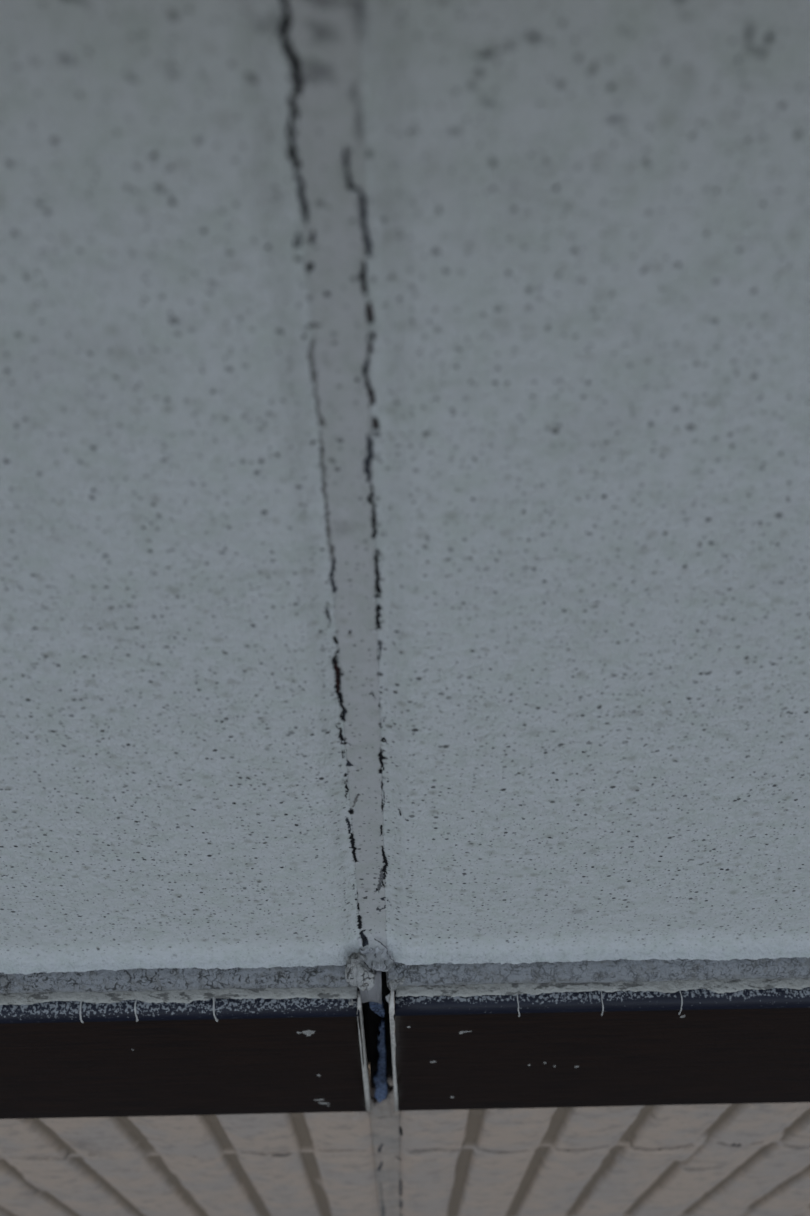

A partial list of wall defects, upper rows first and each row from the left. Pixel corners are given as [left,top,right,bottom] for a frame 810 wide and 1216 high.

crack [266,0,329,296]
crack [302,147,409,951]
peeling [358,938,398,972]